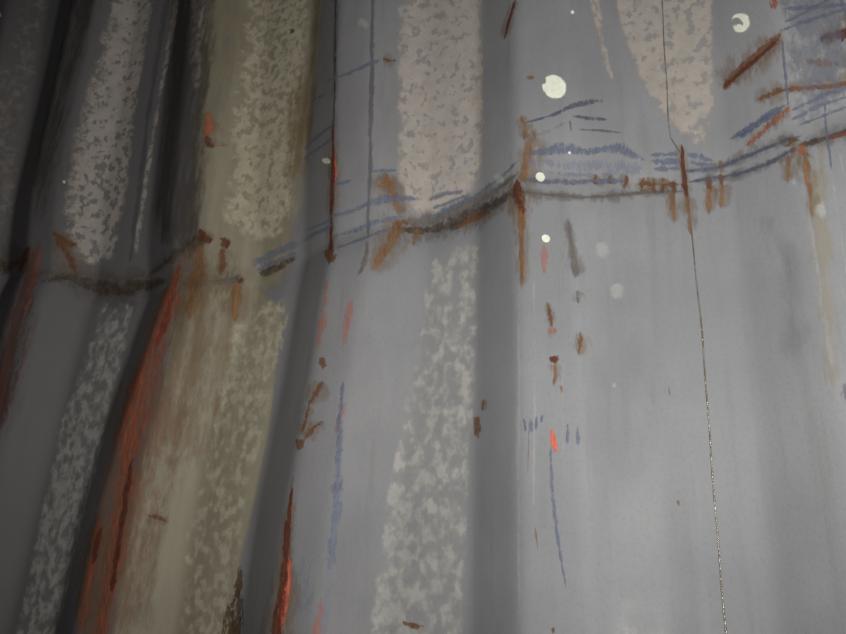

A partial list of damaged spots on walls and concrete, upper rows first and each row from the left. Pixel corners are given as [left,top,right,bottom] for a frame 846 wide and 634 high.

rust [724,34,780,89]
rust [758,81,846,100]
rust [819,29,846,43]
rust [747,107,789,145]
rust [512,117,535,280]
rust [680,145,691,232]
rust [706,162,724,212]
rust [786,138,812,196]
rust [78,246,206,634]
rust [272,485,293,634]